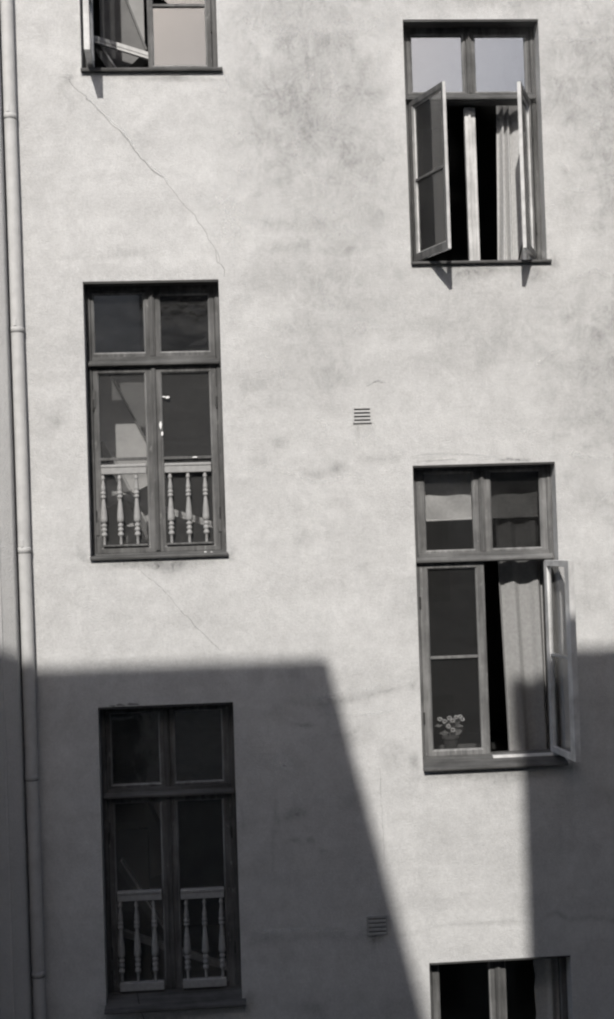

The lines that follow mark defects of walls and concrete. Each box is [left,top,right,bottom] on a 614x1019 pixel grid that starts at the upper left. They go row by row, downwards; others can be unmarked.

crack [69,80,225,273]